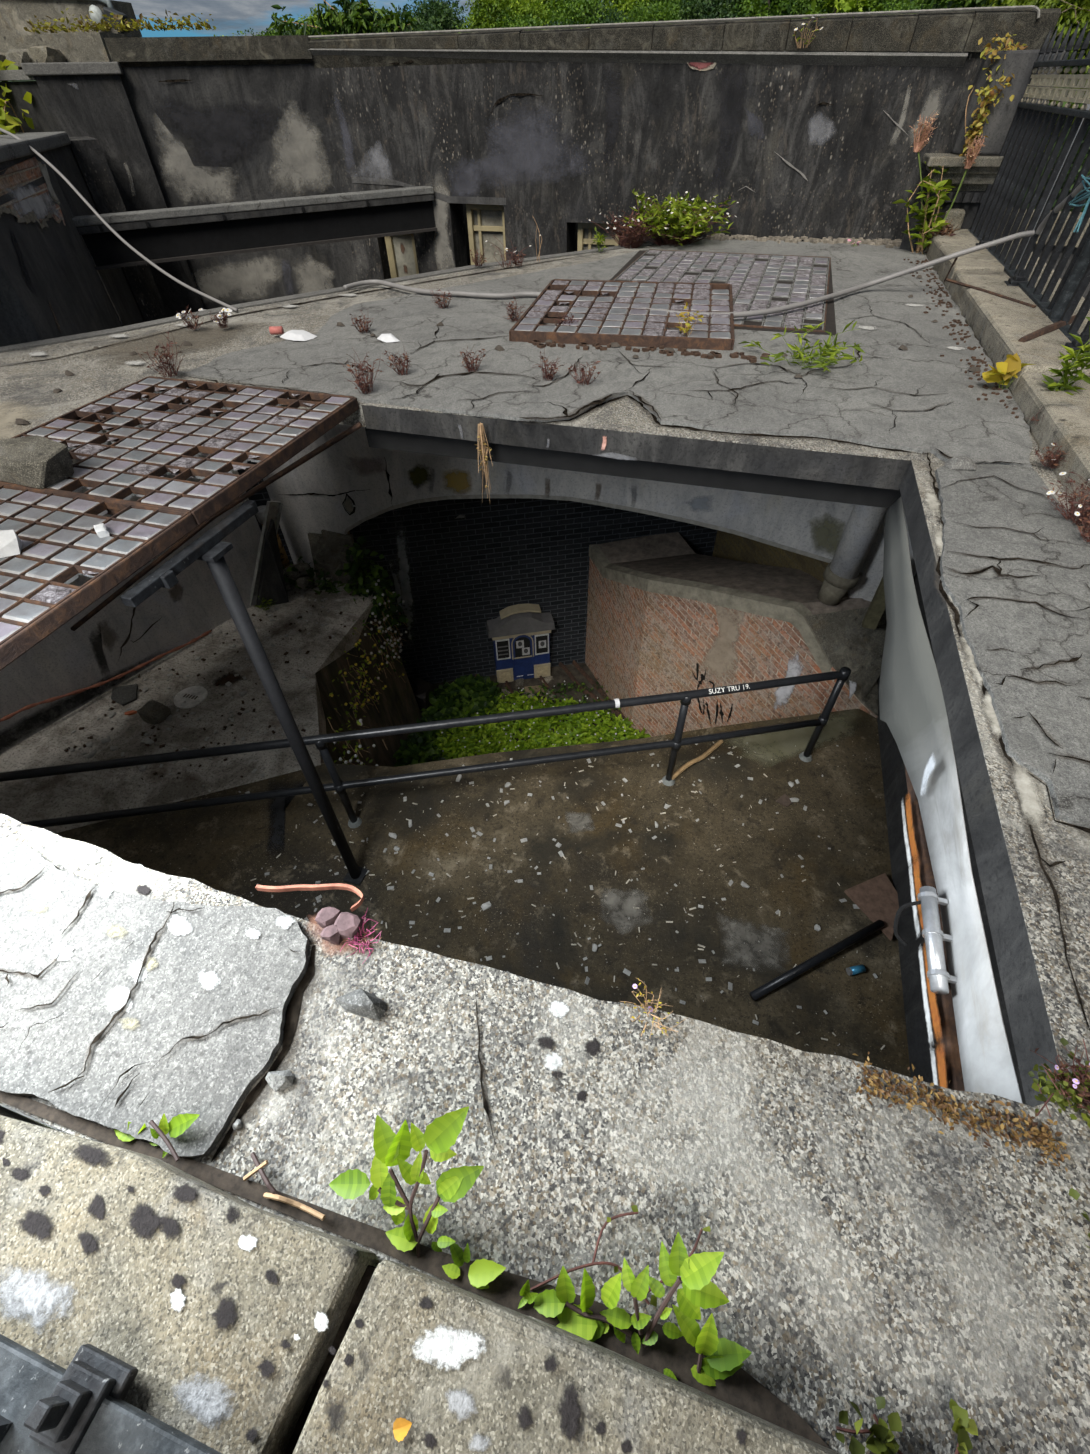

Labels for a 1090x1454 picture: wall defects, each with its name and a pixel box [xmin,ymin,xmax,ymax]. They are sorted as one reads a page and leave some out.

flaking render [0,157,66,229]
damp [156,115,233,201]
damp [273,107,331,191]
damp [335,102,388,178]
damp [432,110,582,270]
damp [192,257,333,301]
crack [194,302,951,431]
crack [937,449,1090,772]
crack [0,861,52,894]
crack [1040,857,1065,867]
crack [0,886,279,1110]
crack [475,989,497,1147]